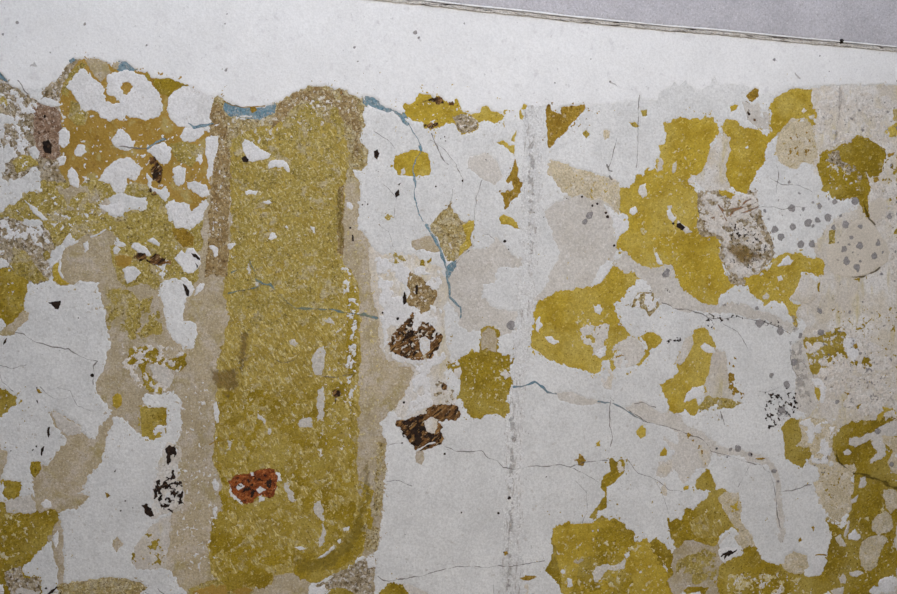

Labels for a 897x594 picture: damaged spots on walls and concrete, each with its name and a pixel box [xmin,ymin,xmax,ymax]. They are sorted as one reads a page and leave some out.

peeling [0,52,601,594]
crack [384,125,481,318]
peeling [520,74,897,594]
crack [836,454,897,489]